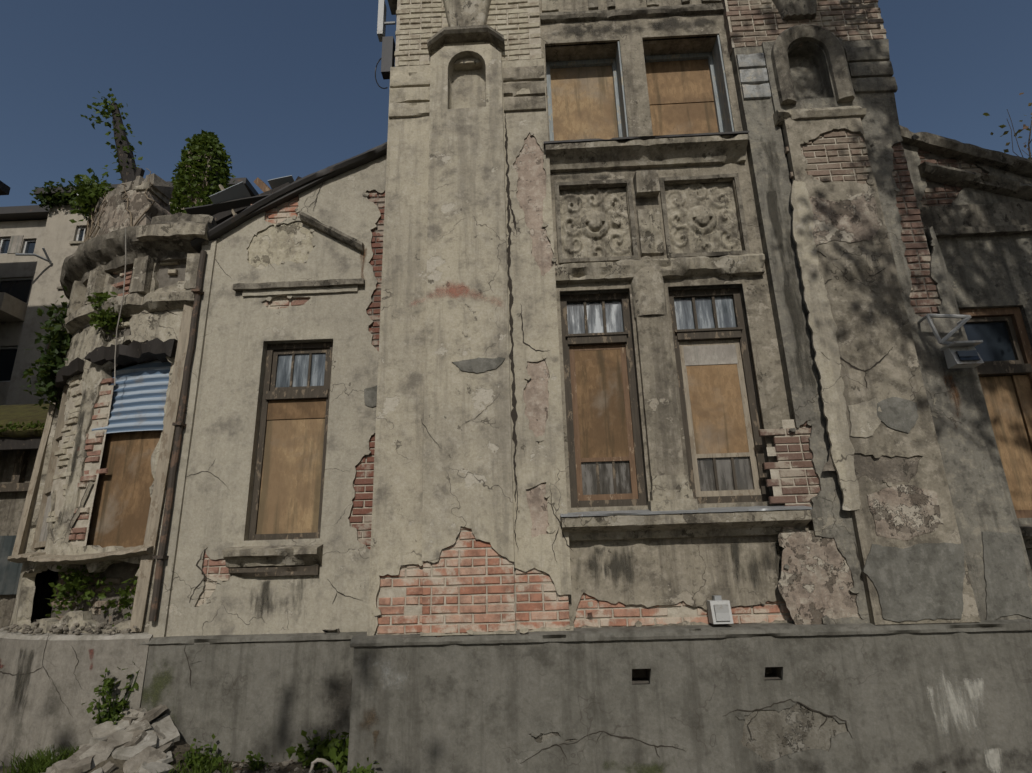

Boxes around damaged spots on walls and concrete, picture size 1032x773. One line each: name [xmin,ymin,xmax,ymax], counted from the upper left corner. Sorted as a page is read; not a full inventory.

spalling [784,130,882,246]
spalling [363,190,385,351]
crack [476,112,550,547]
spalling [349,434,375,549]
crack [550,483,574,562]
spalling [758,419,836,507]
crack [189,550,221,603]
spalling [372,526,712,637]
spalling [731,526,861,625]
crack [0,634,82,716]
crack [518,725,687,763]
crack [721,695,856,739]